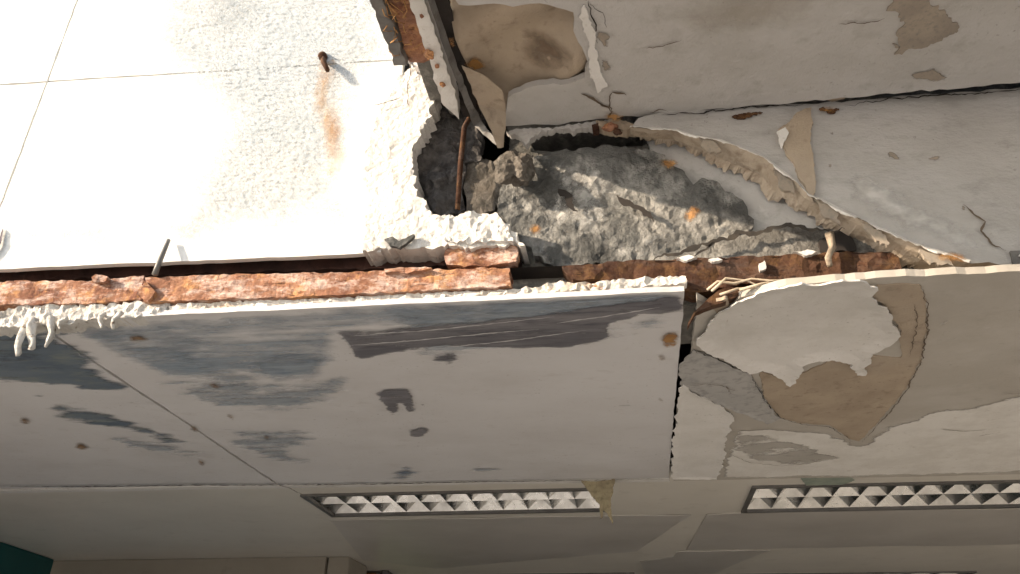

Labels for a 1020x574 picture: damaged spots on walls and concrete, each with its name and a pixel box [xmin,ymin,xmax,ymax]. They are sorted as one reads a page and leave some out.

crack [582,92,626,115]
crack [650,104,802,115]
crack [847,89,1018,106]
spalling [417,0,971,269]
peeling [384,267,433,276]
efflorescence [0,275,687,357]
peeling [90,279,901,480]